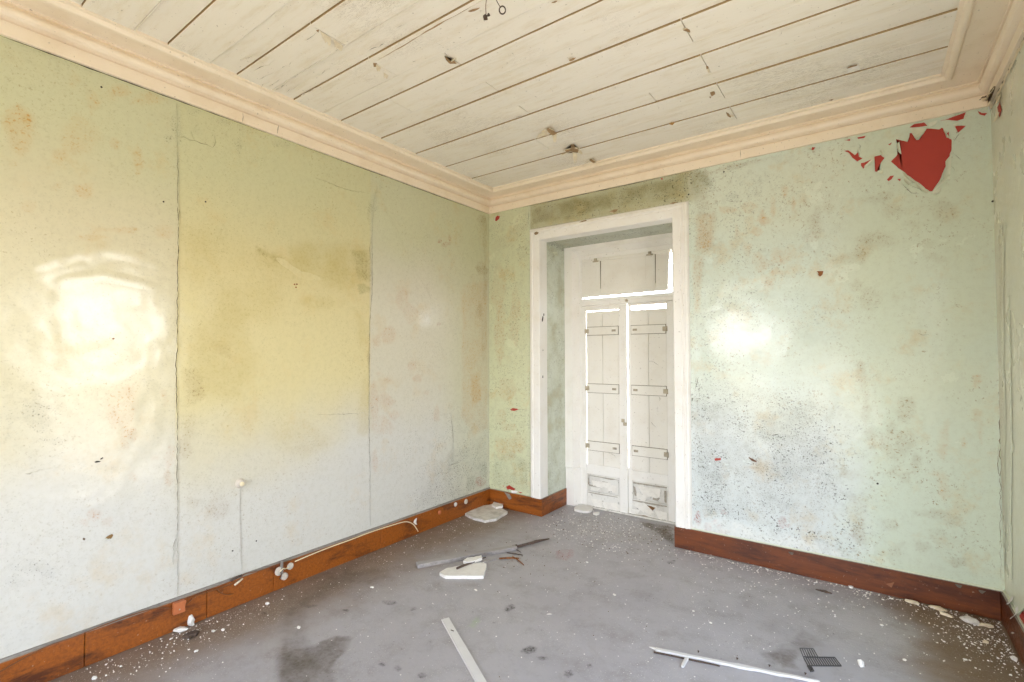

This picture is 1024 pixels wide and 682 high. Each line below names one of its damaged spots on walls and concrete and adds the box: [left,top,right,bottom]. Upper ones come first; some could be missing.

peeling [846,86,1001,194]
crack [0,32,484,597]
damp [73,207,421,524]
damp [406,152,962,513]
damp [691,357,987,570]